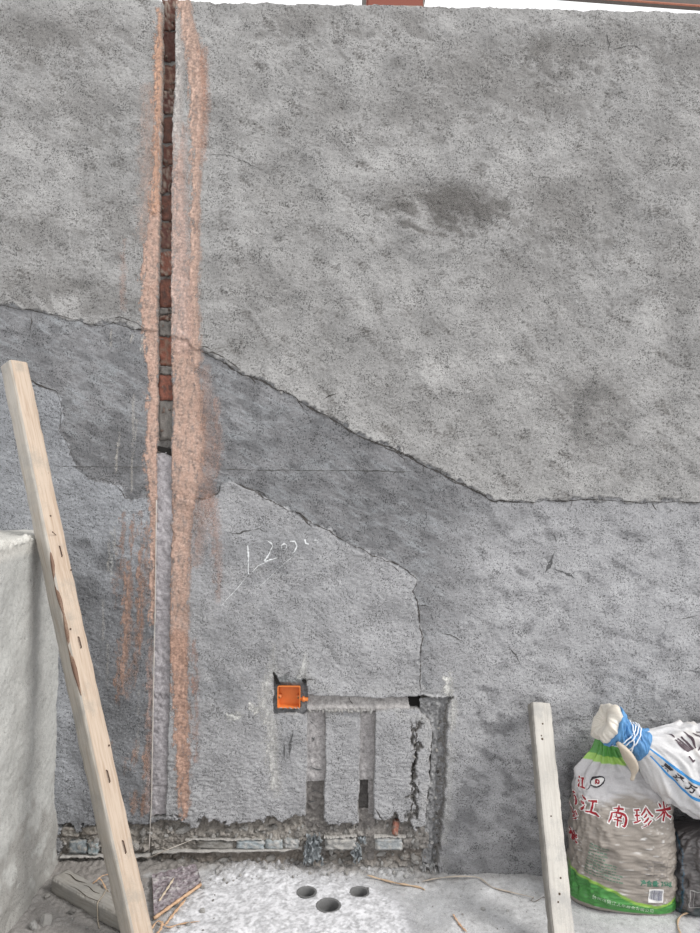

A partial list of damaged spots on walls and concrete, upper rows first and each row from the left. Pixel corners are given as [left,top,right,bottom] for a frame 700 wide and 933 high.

crack [3,305,146,332]
crack [31,380,145,499]
crack [174,337,700,694]
crack [406,716,419,815]